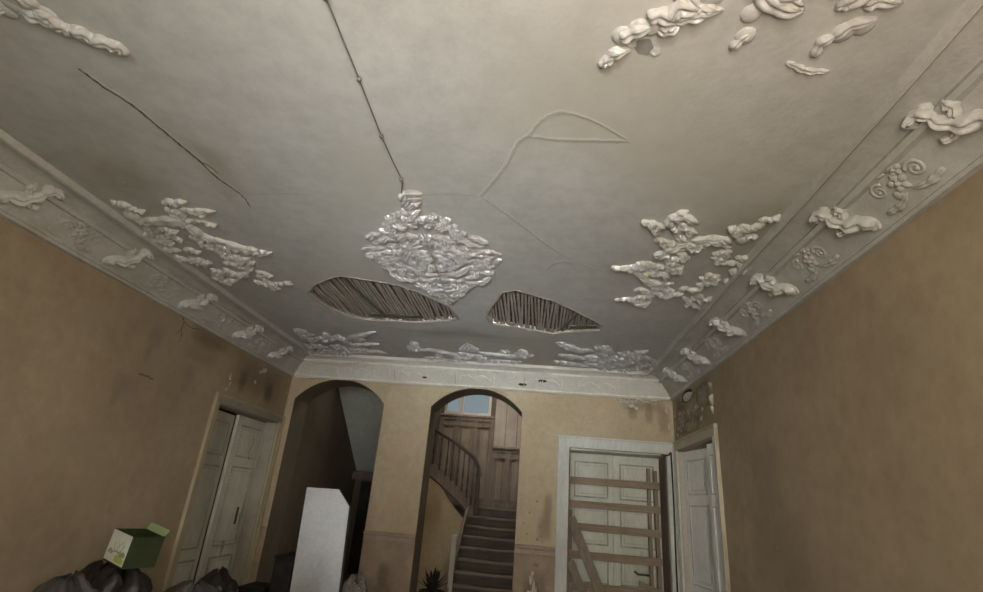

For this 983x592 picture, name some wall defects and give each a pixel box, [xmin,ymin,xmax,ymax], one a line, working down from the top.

crack [79,68,253,207]
spalling [306,276,459,323]
spalling [485,290,603,335]
peeling [616,382,714,439]